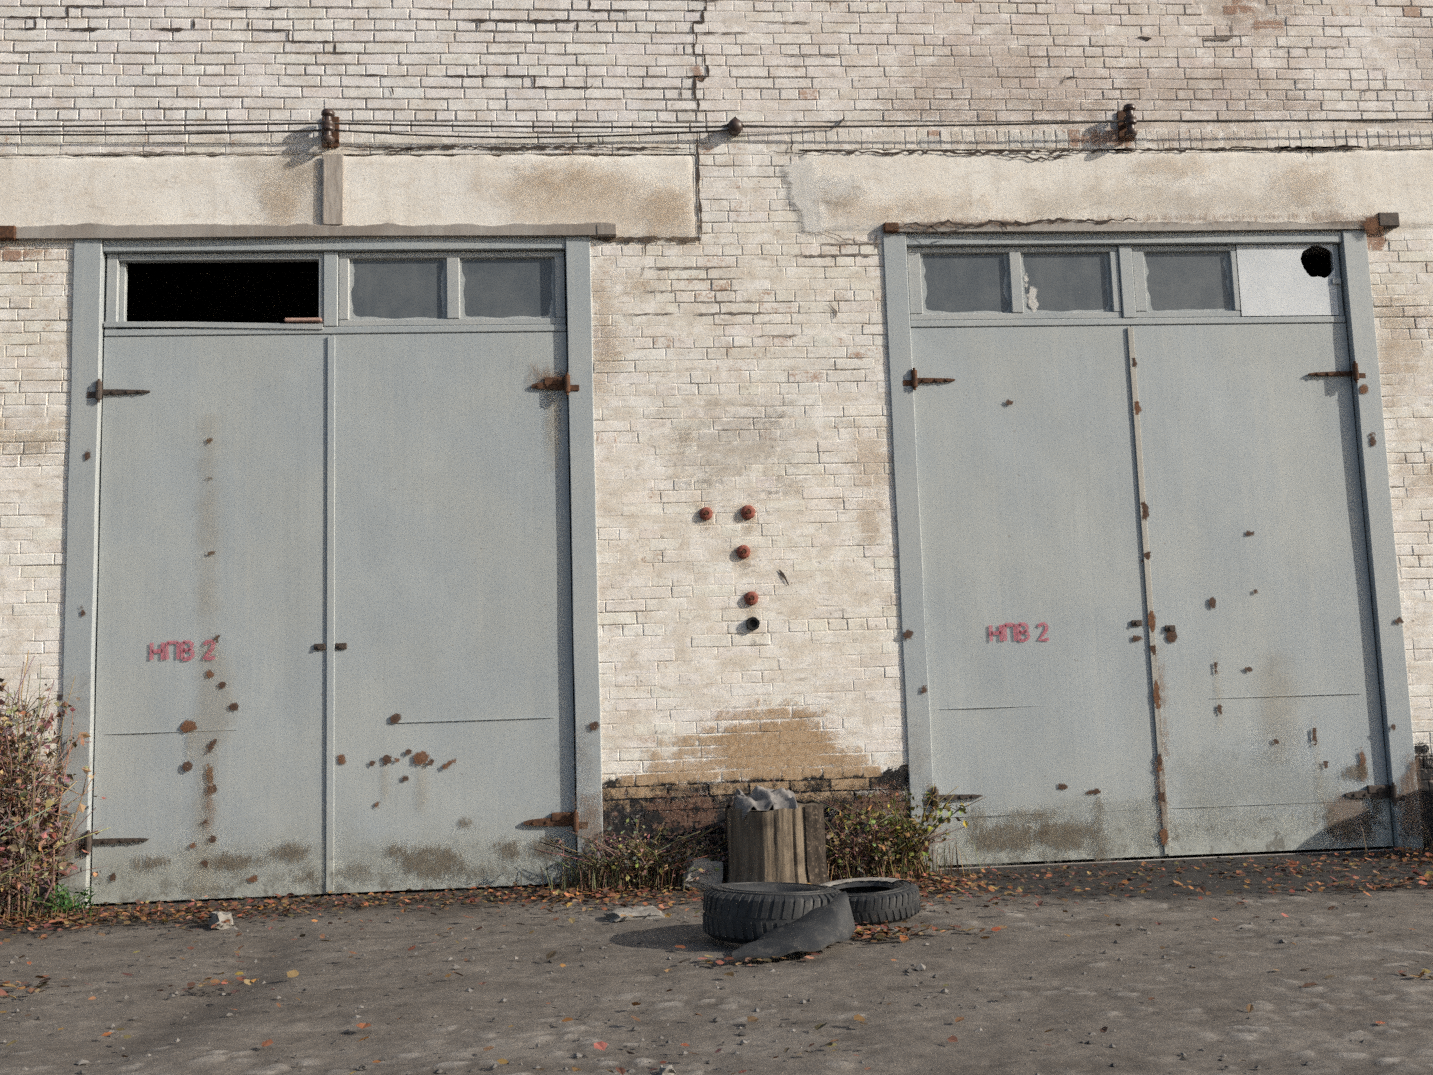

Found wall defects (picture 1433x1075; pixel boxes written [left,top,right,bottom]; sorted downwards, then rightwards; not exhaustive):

crack [344,0,840,337]
corrosion [1141,501,1149,520]
corrosion [180,720,197,733]
corrosion [183,739,217,867]
corrosion [369,749,456,781]
corrosion [1133,611,1177,845]
corrosion [1323,747,1382,845]
corrosion [1399,758,1428,842]